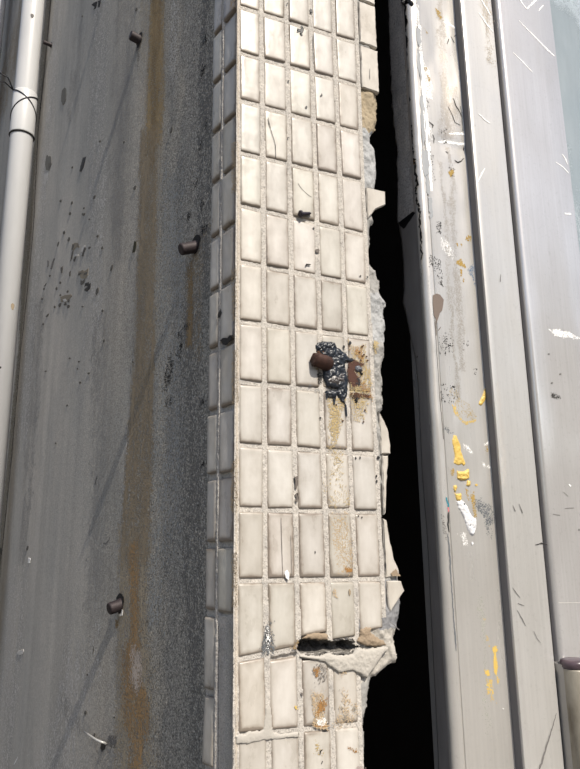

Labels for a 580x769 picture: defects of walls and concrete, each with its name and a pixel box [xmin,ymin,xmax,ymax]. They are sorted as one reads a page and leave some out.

spalling [41,230,91,325]
corrosion [120,0,166,572]
spalling [295,265,404,754]
corrosion [323,339,379,577]